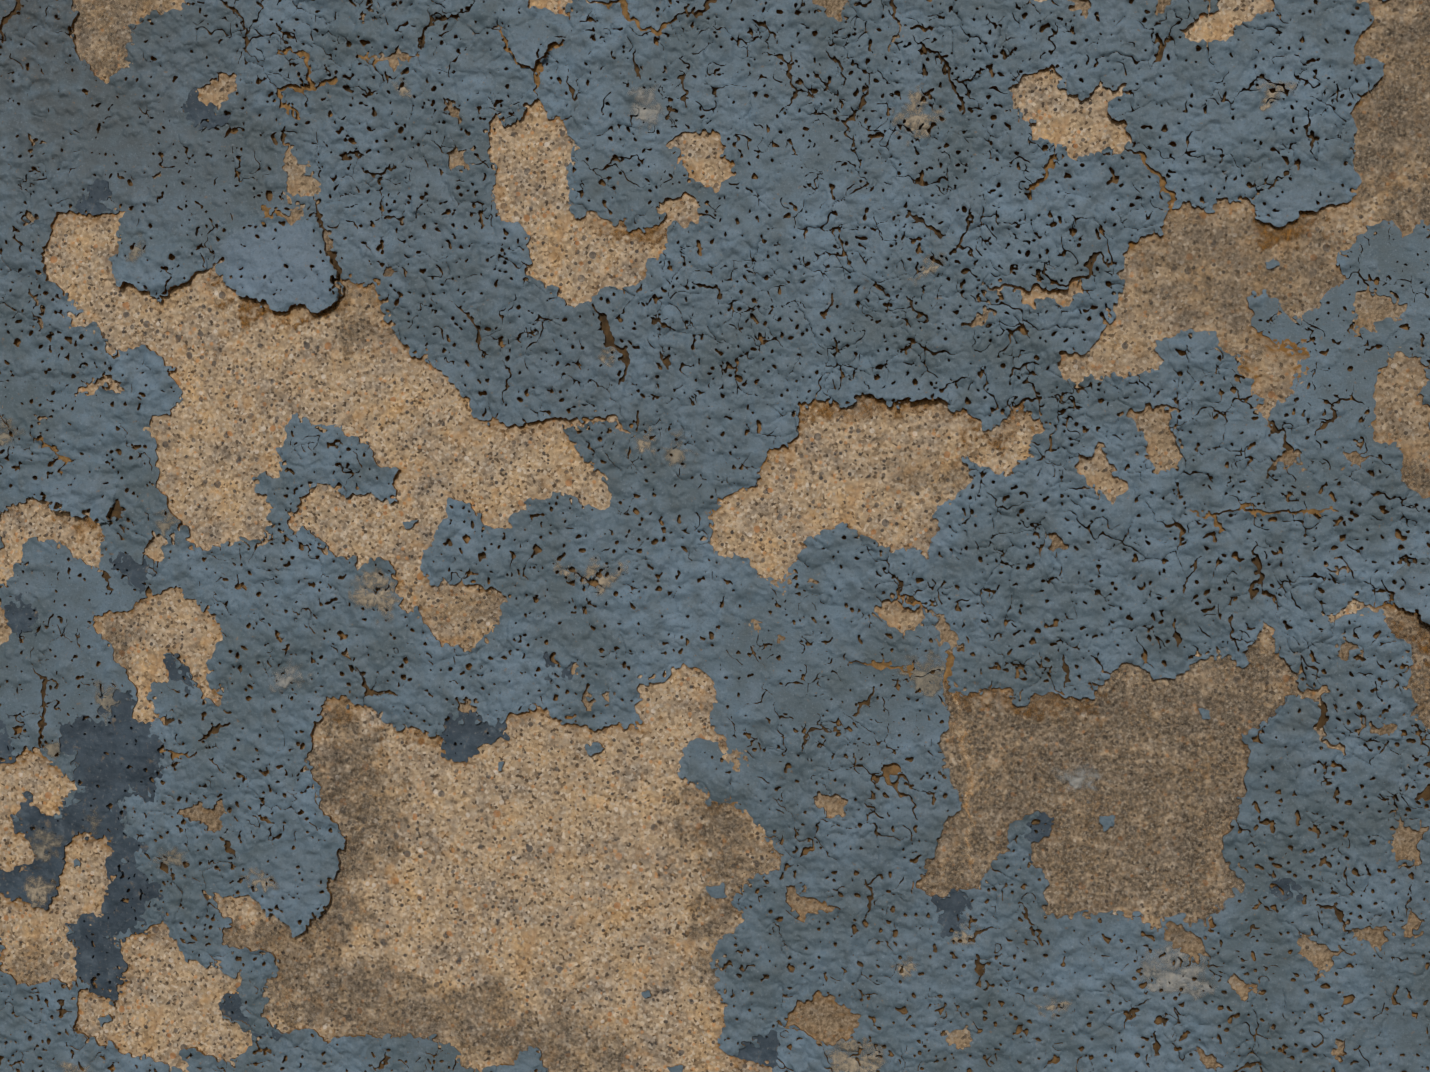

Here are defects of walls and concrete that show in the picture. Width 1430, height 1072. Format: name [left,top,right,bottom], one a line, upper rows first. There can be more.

crack [597,0,717,79]
crack [753,20,869,152]
crack [889,0,983,115]
peeling [442,92,737,308]
crack [905,207,977,266]
peeling [1048,0,1430,429]
peeling [18,143,636,652]
crack [593,305,684,431]
peeling [701,368,1053,595]
crack [1183,408,1339,651]
peeling [0,662,791,1072]
peeling [911,617,1330,963]